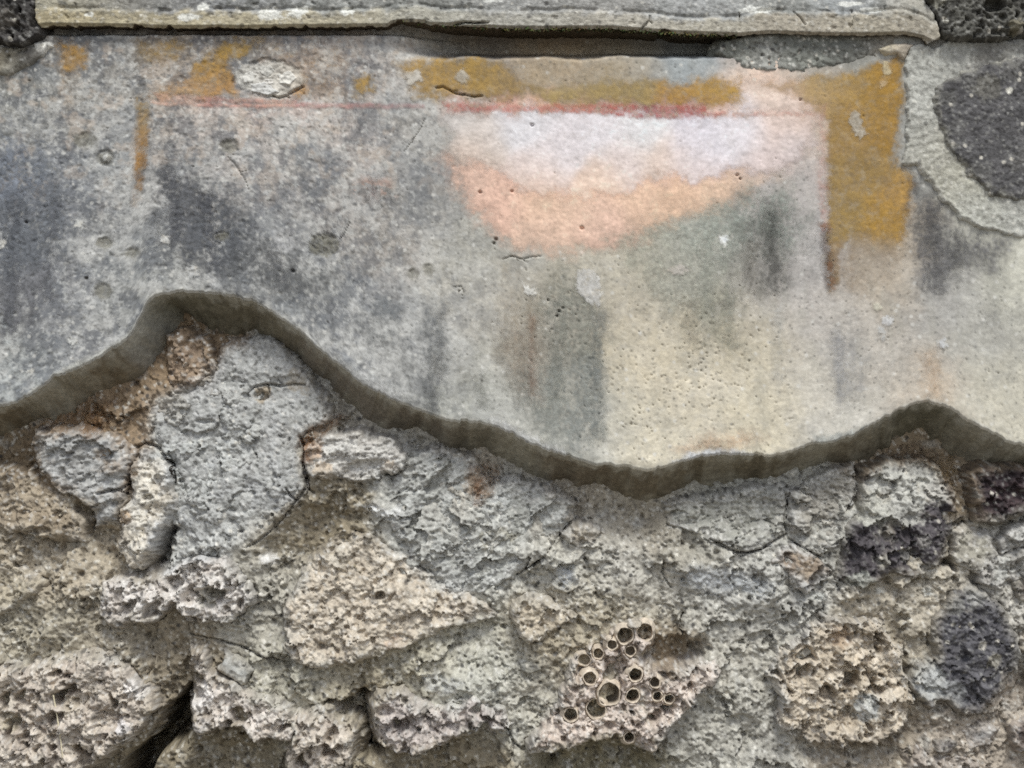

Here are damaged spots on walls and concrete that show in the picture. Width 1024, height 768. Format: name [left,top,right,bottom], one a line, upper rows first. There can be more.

flaking render [235,60,304,98]
water stain [156,164,328,301]
water stain [914,190,1004,286]
spalling [0,291,1024,503]
crack [250,438,311,546]
crack [715,492,823,558]